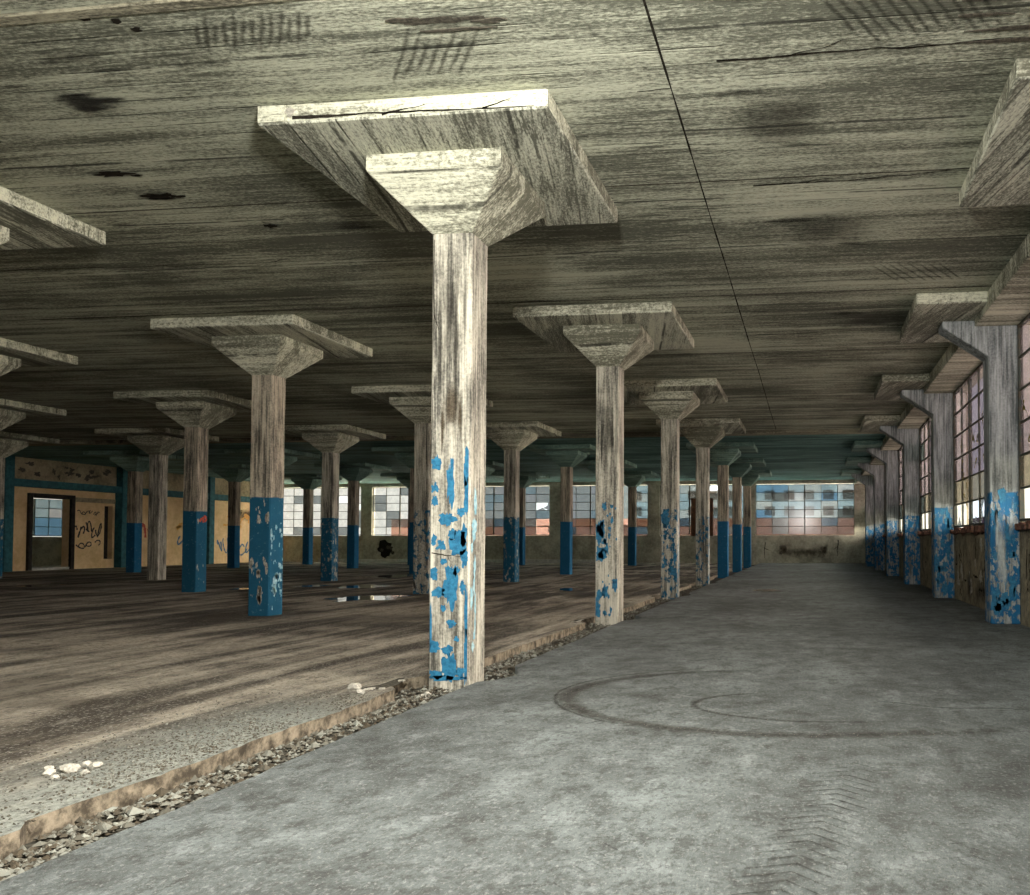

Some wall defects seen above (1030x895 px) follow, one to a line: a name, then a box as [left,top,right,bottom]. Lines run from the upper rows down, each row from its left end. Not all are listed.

water stain [60,94,122,111]
crack [637,0,776,429]
peeling [249,496,283,610]
peeling [413,446,477,685]
peeling [596,502,617,562]
peeling [596,574,617,617]
peeling [661,510,676,580]
peeling [935,487,1017,617]